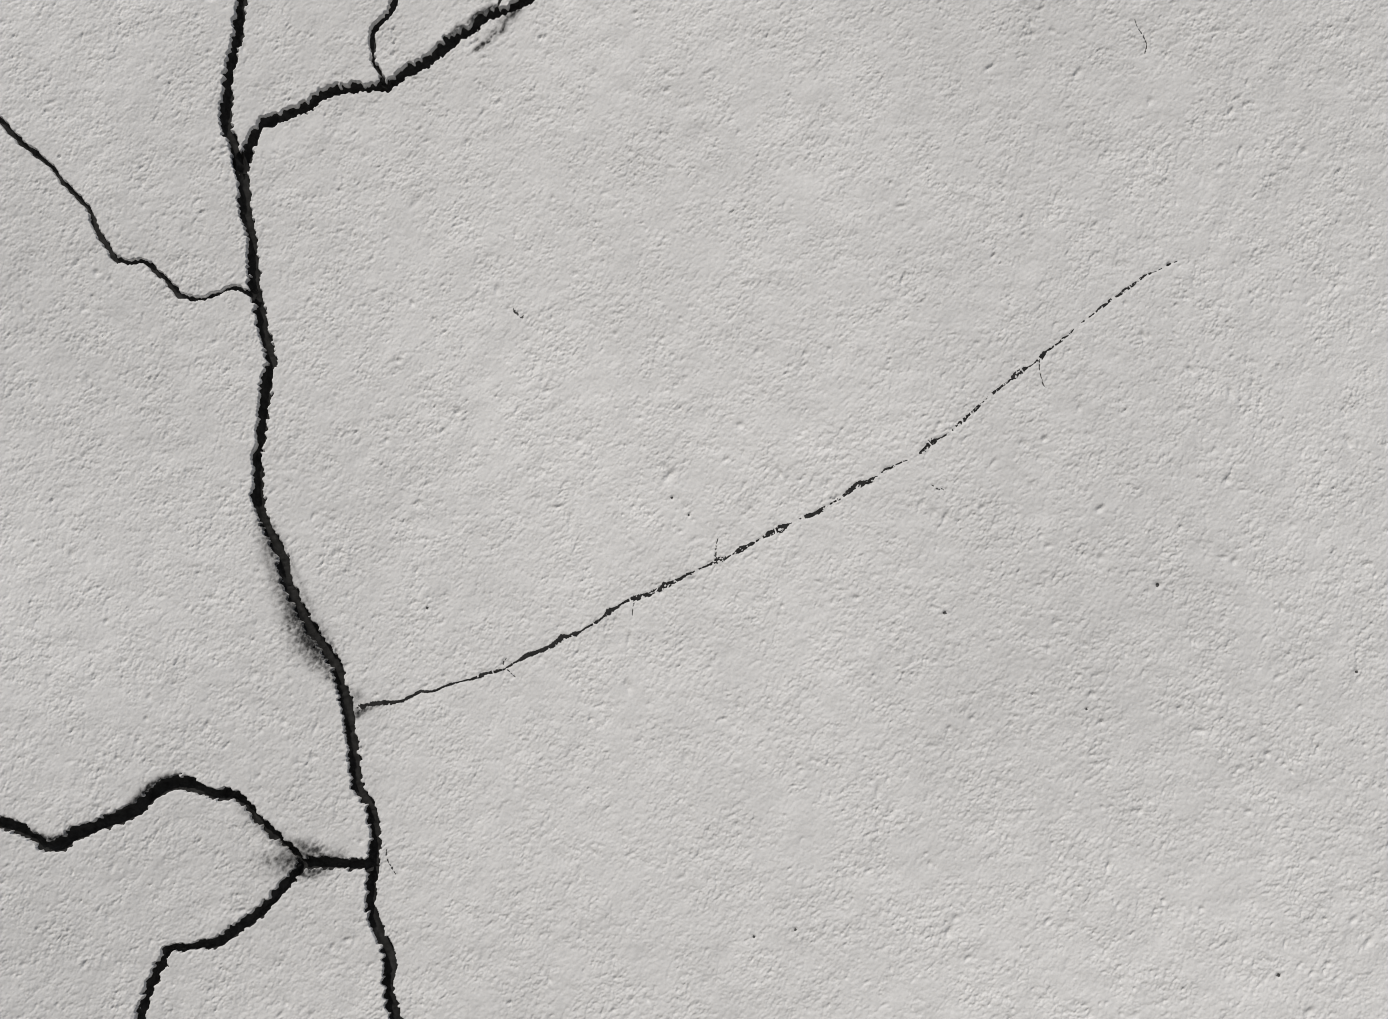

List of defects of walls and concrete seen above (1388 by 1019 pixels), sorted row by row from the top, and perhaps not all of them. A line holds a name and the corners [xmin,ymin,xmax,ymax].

crack [0,0,907,1019]
crack [919,261,1177,454]